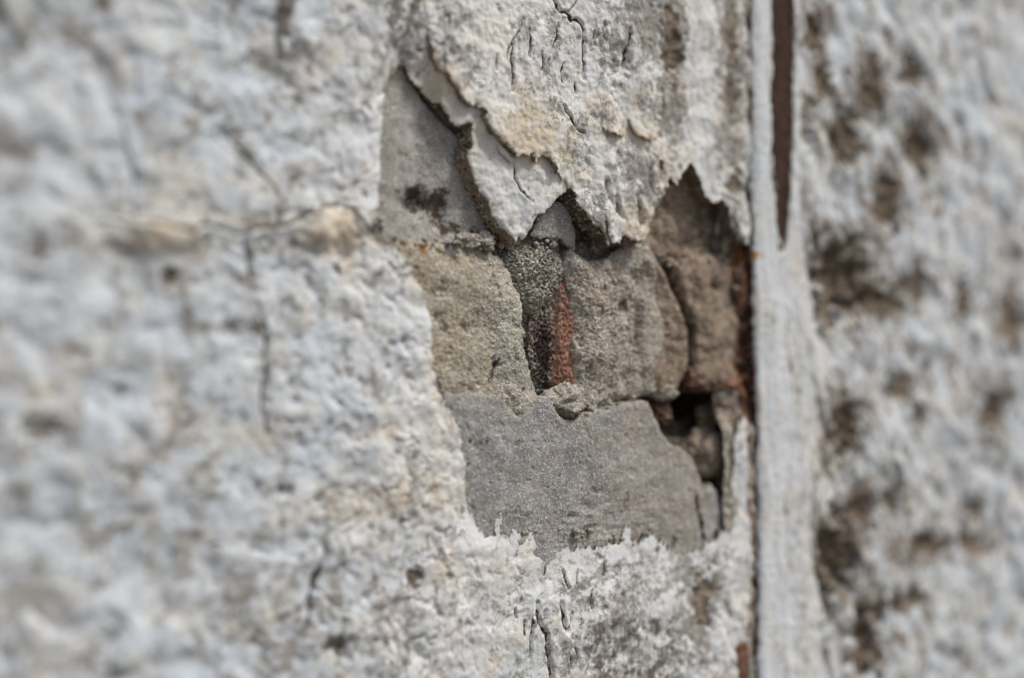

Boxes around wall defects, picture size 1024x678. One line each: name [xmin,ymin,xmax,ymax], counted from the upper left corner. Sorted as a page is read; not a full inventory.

flaking render [372,0,751,637]
crack [495,0,631,133]